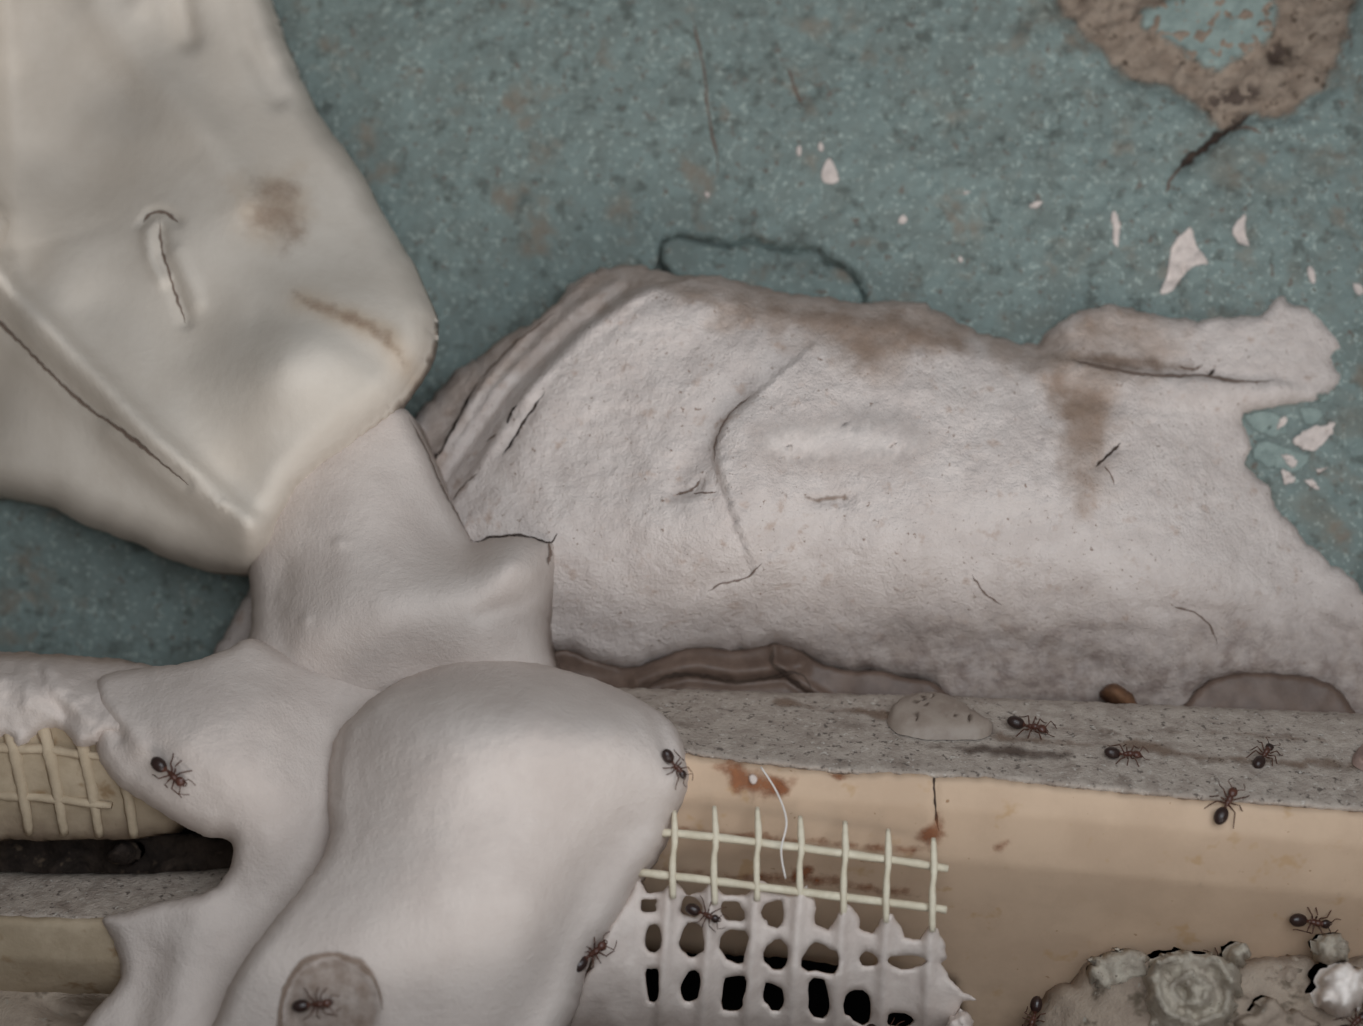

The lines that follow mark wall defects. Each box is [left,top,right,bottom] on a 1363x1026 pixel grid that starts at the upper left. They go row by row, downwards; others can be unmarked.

spalling [1058,0,1356,131]
crack [143,210,185,322]
peeling [660,236,864,303]
crack [0,322,188,485]
crack [411,313,558,565]
crack [675,397,749,495]
peeling [1245,393,1335,489]
crack [706,563,762,593]